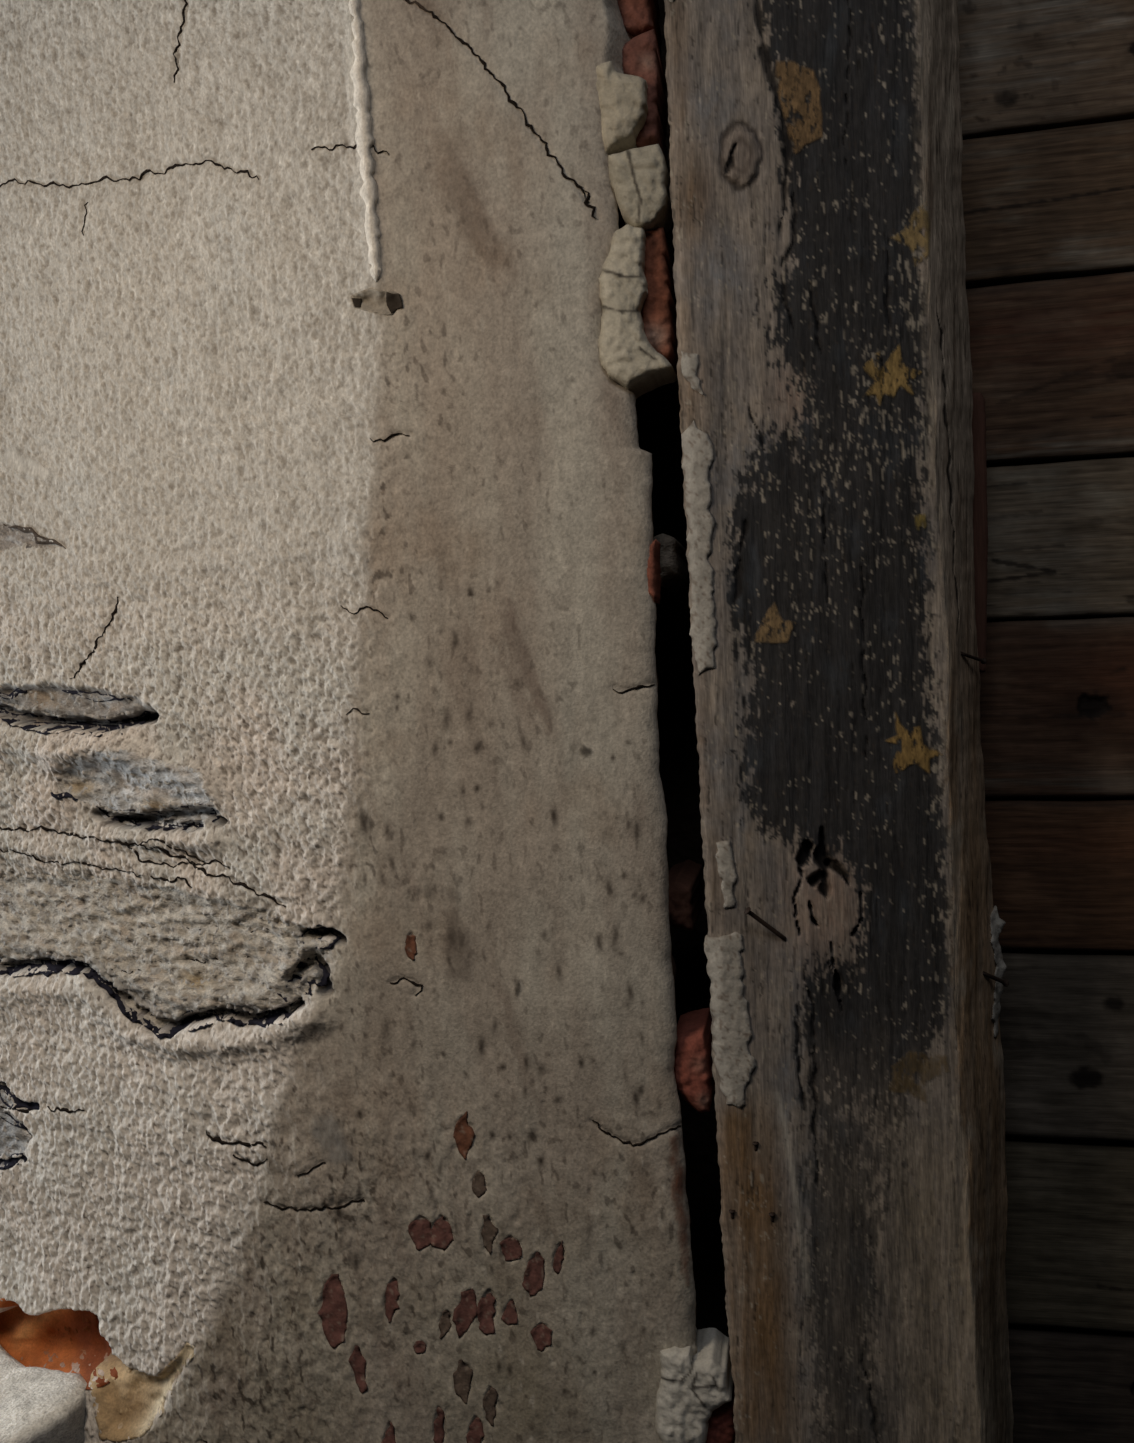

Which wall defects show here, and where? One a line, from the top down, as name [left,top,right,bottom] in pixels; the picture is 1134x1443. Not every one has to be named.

crack [173,0,188,83]
crack [0,160,259,235]
crack [311,144,389,155]
crack [405,0,596,219]
spalling [0,684,222,833]
crack [0,825,286,976]
spalling [0,1082,40,1170]
spalling [453,1111,475,1159]
spalling [317,1274,368,1393]
spalling [408,1215,564,1354]
peeling [90,1343,194,1442]
spalling [453,1359,498,1443]